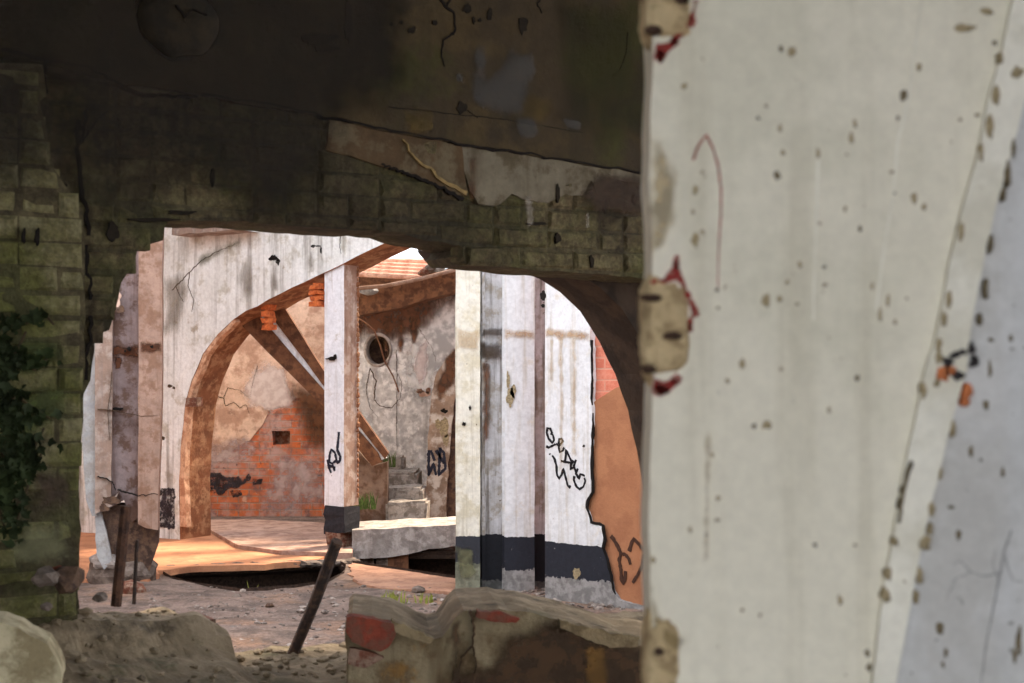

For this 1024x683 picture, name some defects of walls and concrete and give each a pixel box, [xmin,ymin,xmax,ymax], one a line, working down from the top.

crack [440,0,457,67]
spalling [638,0,698,63]
flaking render [324,120,468,201]
crack [330,106,642,174]
peeling [652,155,671,245]
crack [175,243,235,310]
spalling [638,255,699,396]
peeling [761,279,789,307]
crack [218,366,258,412]